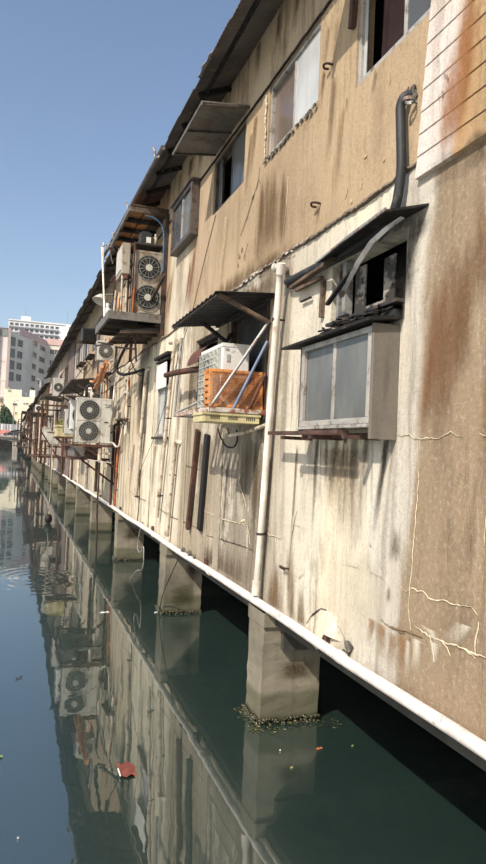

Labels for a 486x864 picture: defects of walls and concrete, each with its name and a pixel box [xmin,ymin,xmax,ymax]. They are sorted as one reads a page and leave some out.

corrosion [447,21,467,120]
leakage [258,187,285,244]
leakage [314,439,367,479]
leakage [378,440,391,495]
crack [341,431,486,660]